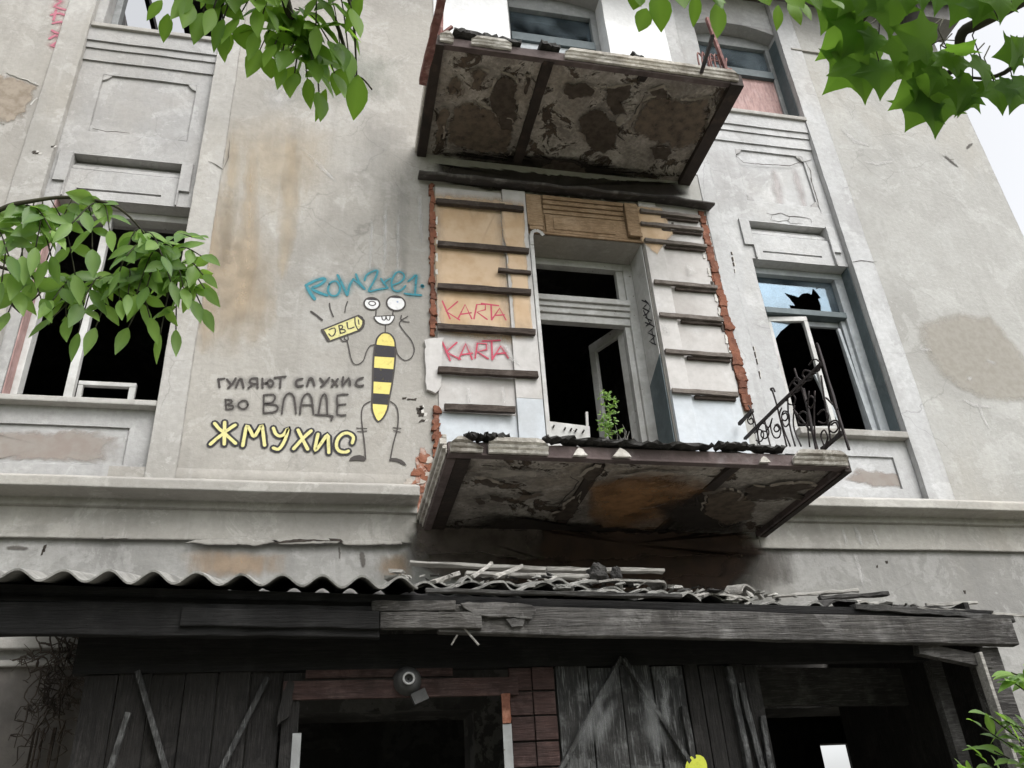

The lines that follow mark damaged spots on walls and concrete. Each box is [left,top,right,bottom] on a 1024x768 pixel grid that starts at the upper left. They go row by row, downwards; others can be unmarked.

spalling [0,75,38,125]
spalling [442,67,532,156]
spalling [564,82,714,161]
flaking render [402,183,444,513]
spalling [694,209,761,412]
spalling [0,430,113,461]
spalling [848,469,901,487]